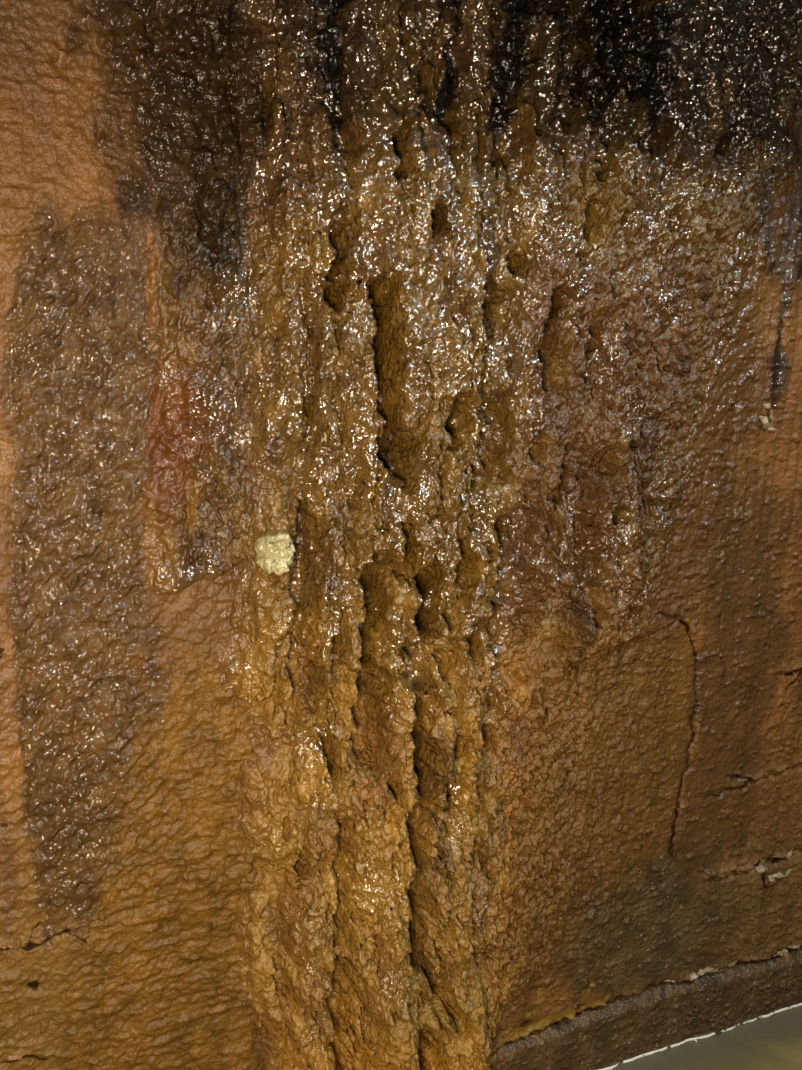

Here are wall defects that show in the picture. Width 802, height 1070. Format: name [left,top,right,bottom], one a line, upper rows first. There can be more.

damp [528,0,802,319]
damp [759,323,789,431]
damp [1,0,547,1070]
crack [657,611,705,856]
damp [674,487,788,869]
crack [716,850,793,888]
crack [714,759,802,798]
crack [495,946,802,1053]